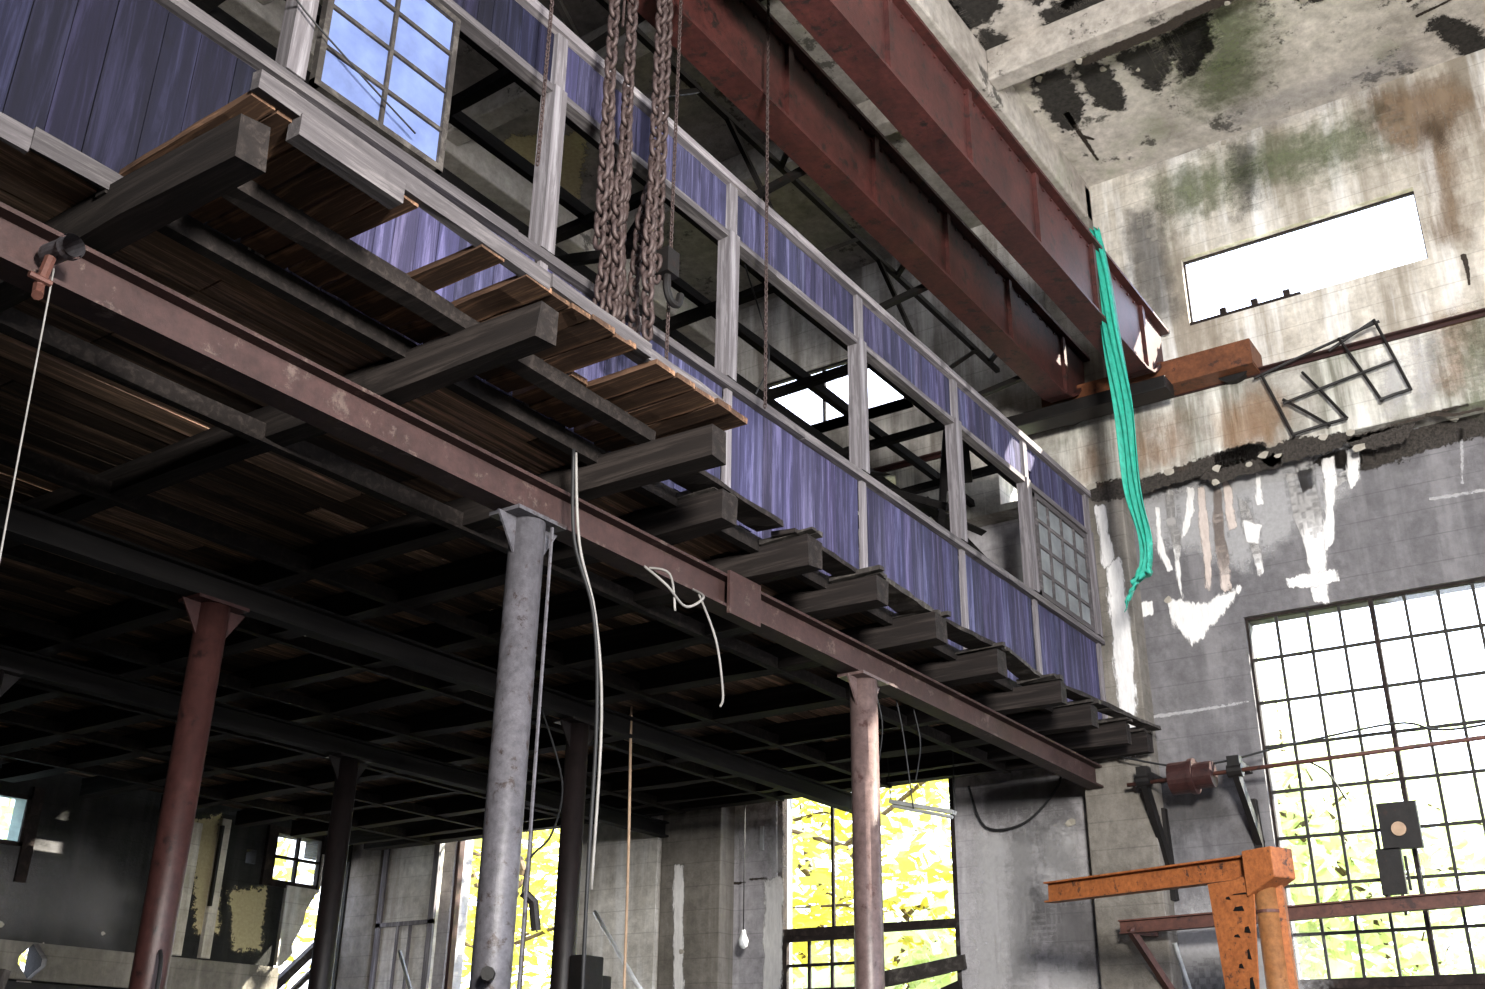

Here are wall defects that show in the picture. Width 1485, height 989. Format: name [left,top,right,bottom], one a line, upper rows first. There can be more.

leakage [1130,213,1170,314]
peeling [1142,585,1241,646]